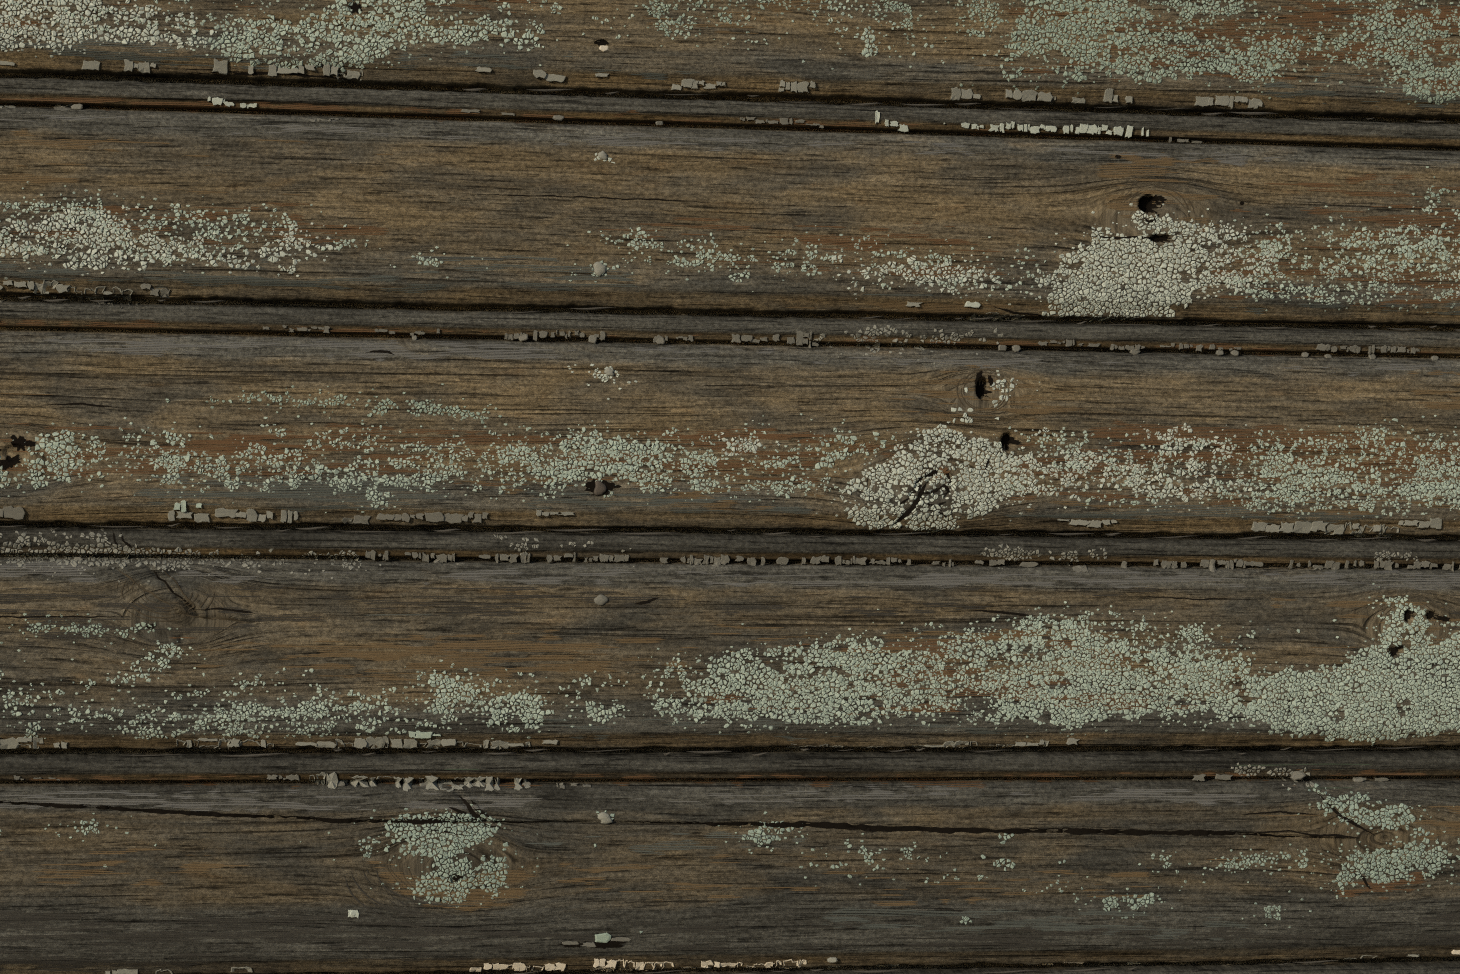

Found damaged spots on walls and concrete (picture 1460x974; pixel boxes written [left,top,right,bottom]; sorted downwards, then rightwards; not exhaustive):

peeling [0,0,566,83]
peeling [208,96,257,109]
peeling [875,110,908,132]
peeling [943,121,1149,138]
peeling [569,166,1460,365]
crack [0,531,255,629]
peeling [0,370,1460,749]
peeling [267,772,539,908]
peeling [718,811,1016,887]
peeling [1022,763,1460,928]
peeling [470,963,566,972]
peeling [562,931,807,972]